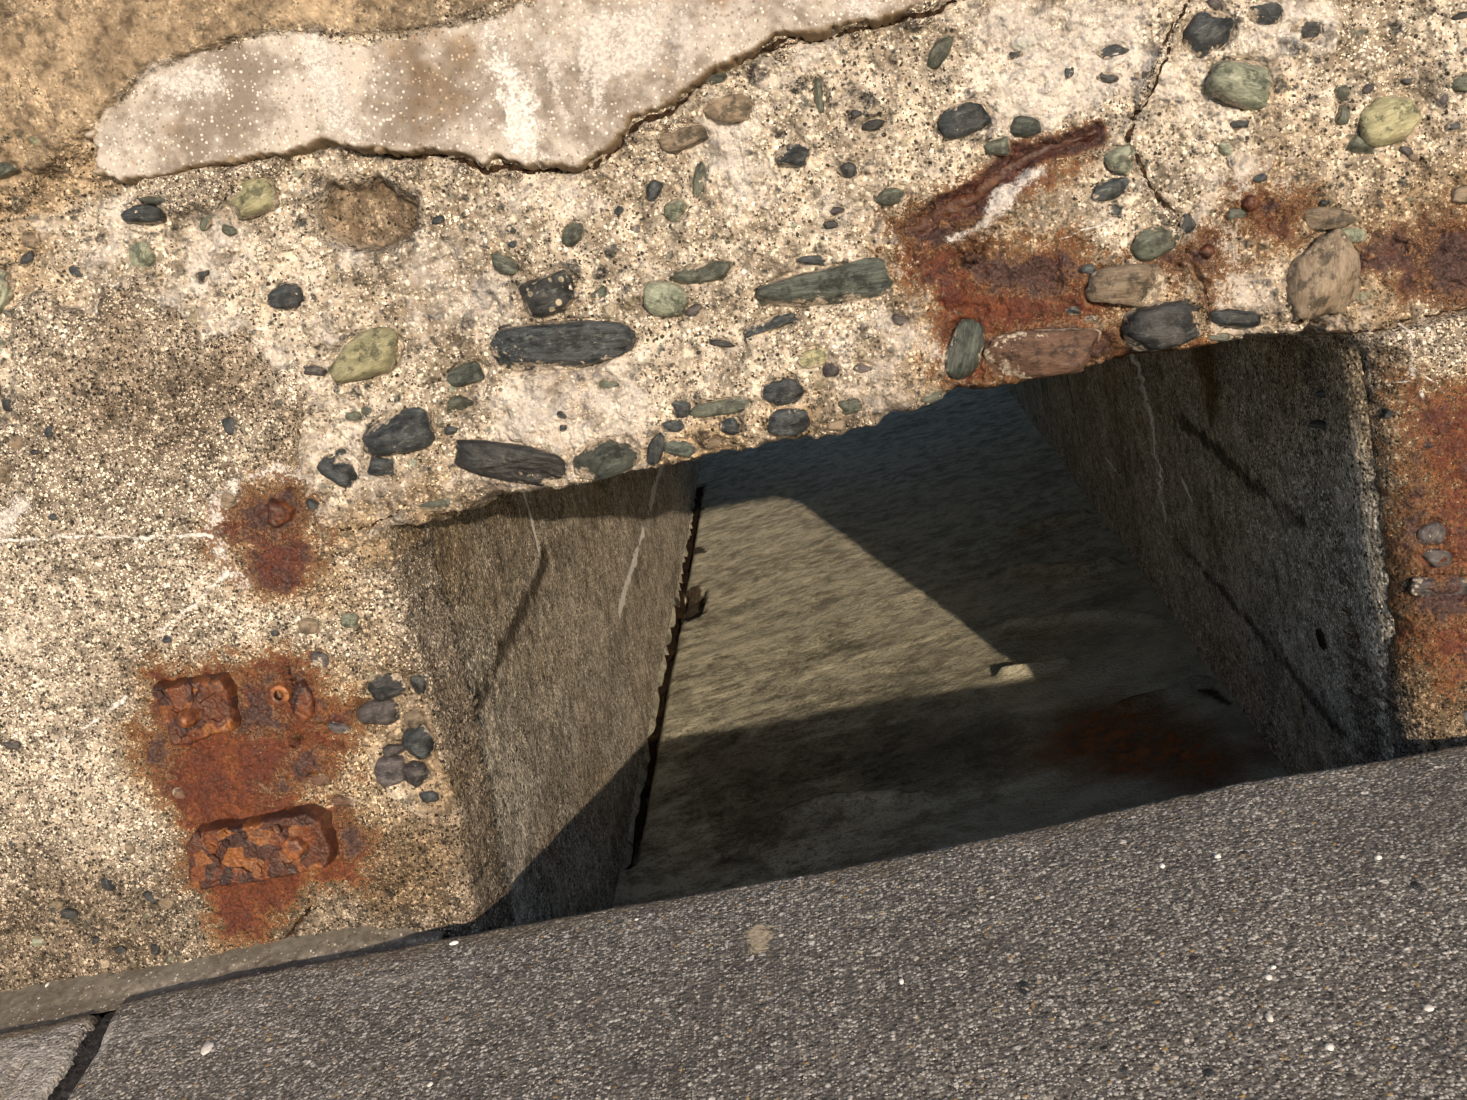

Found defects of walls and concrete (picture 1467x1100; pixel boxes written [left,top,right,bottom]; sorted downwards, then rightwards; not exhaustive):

crack [376,90,694,175]
crack [740,0,957,65]
crack [1062,218,1116,239]
corrosion [860,113,1339,391]
crack [1125,0,1210,330]
corrosion [108,636,396,953]
corrosion [192,459,346,608]
crack [617,465,664,619]
crack [625,487,703,870]
corrosion [1354,178,1467,718]